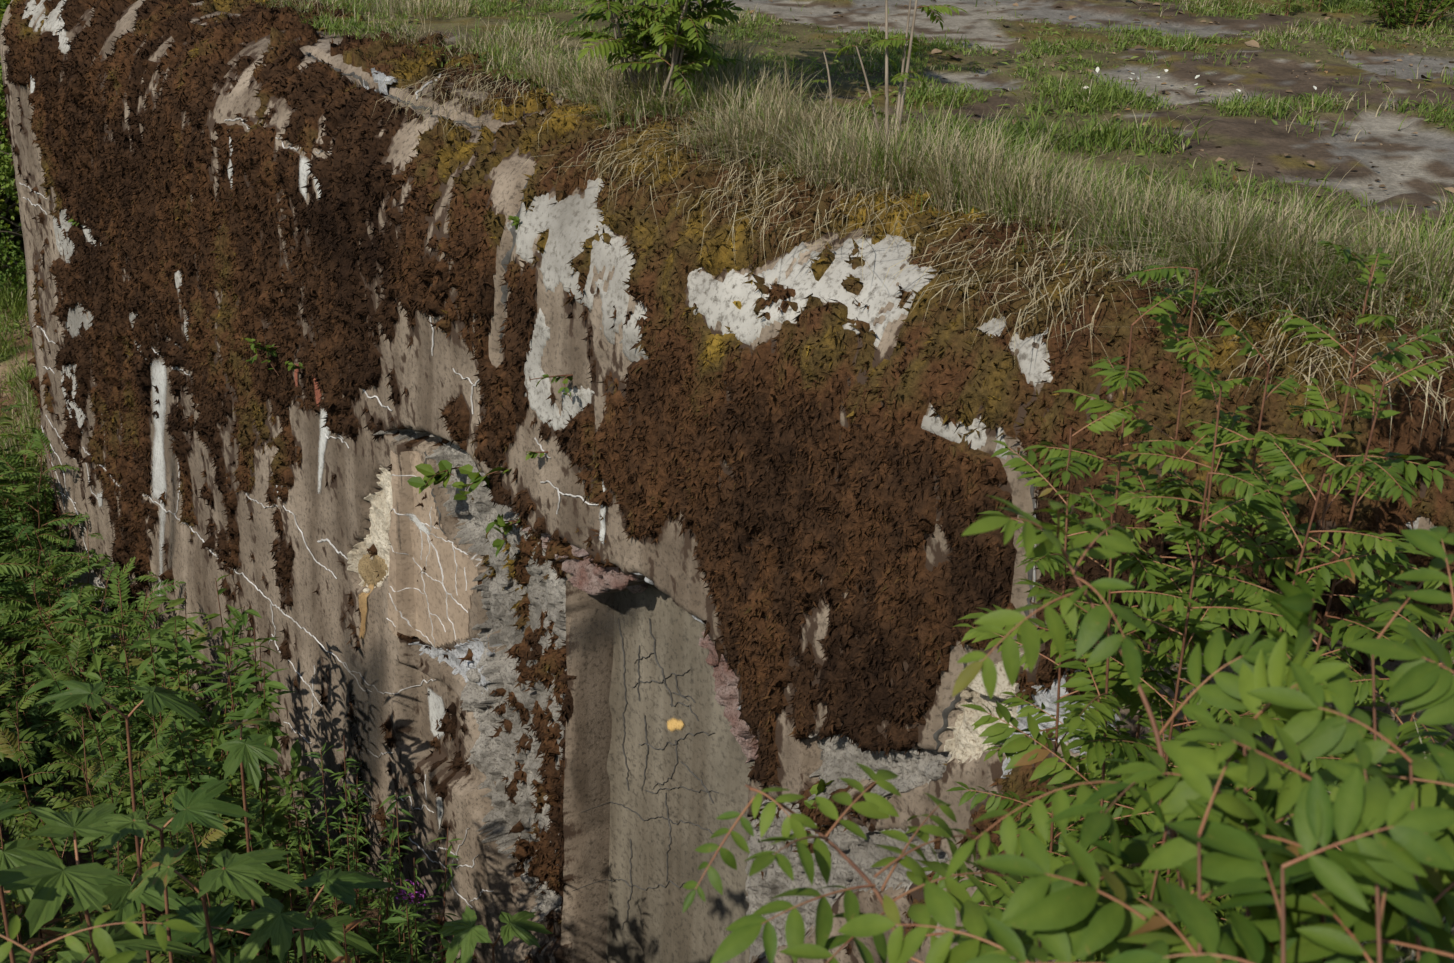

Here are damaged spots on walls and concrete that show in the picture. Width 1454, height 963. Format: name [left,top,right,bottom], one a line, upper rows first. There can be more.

crack [41,415,350,743]
spalling [347,465,393,593]
crack [346,774,491,908]
crack [380,451,482,694]
spalling [373,429,654,922]
crack [571,618,719,930]